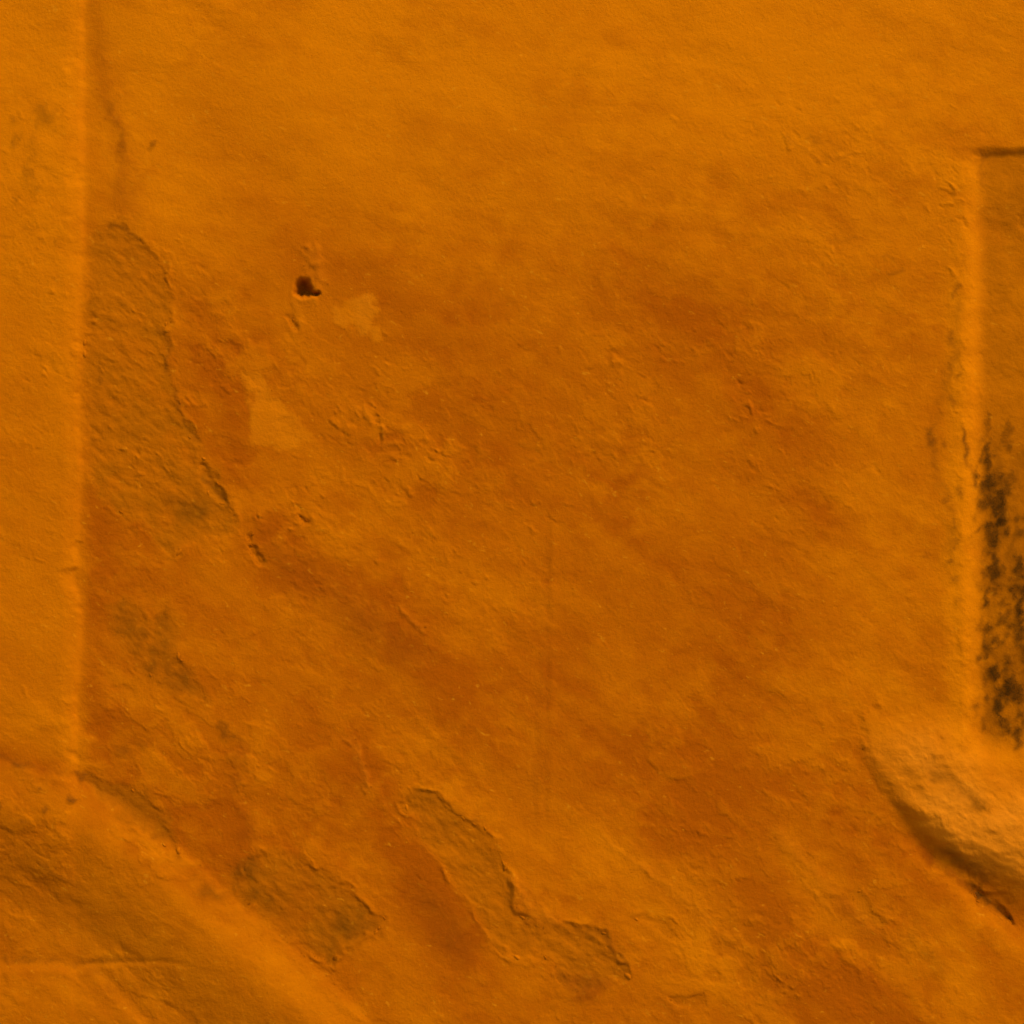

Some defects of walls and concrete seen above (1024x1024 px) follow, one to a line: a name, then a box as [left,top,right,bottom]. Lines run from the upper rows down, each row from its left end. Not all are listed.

spalling [297,281,319,296]
damp [977,445,1024,747]